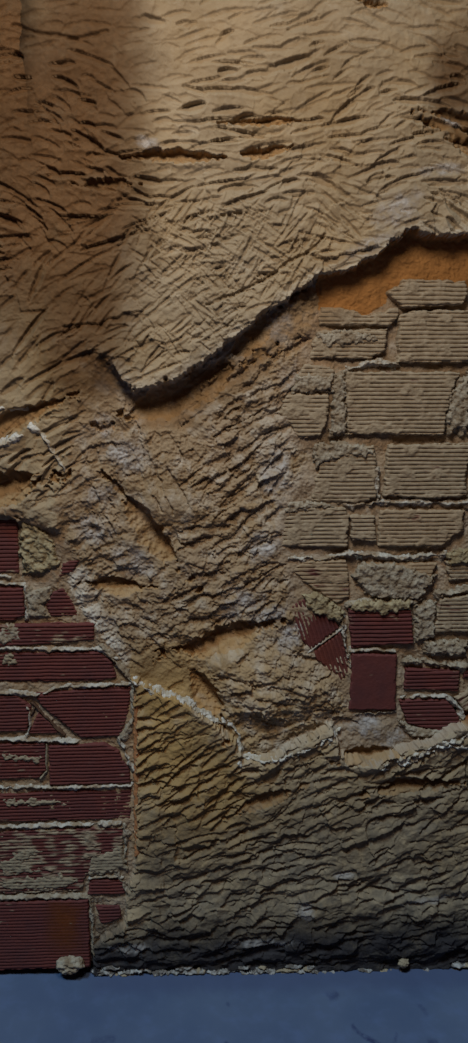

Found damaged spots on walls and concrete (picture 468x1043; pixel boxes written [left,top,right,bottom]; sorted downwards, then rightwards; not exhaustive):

spalling [0,228,468,977]